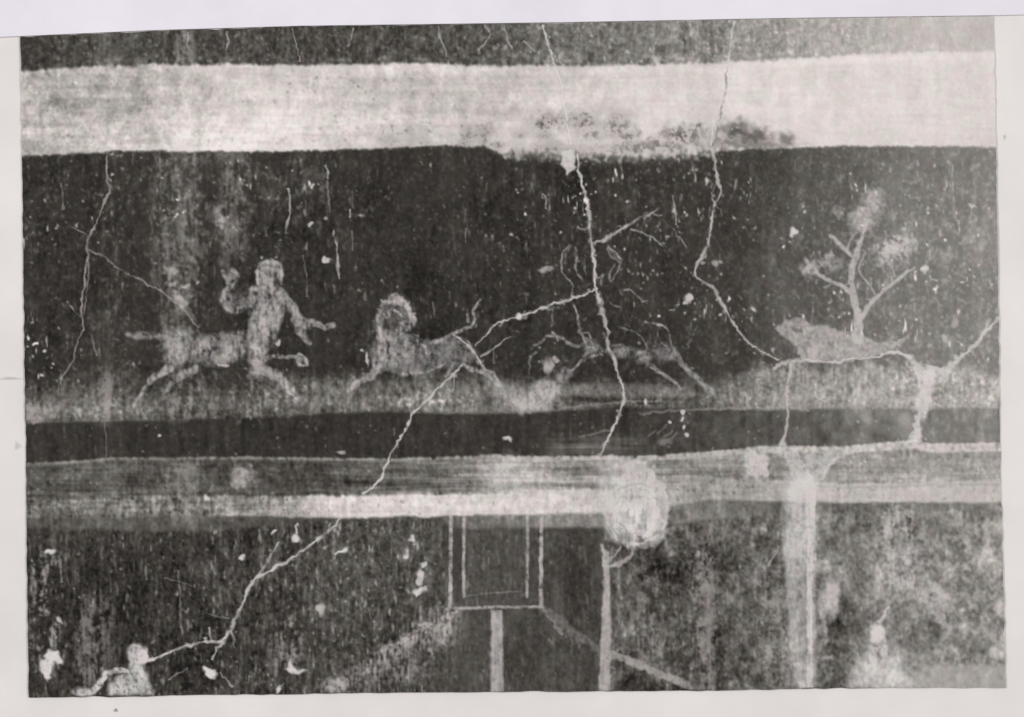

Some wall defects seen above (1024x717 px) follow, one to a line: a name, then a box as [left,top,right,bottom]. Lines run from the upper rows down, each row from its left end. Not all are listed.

crack [362,25,601,494]
crack [694,146,999,442]
crack [605,327,625,443]
crack [239,521,338,610]
peeling [41,651,62,679]